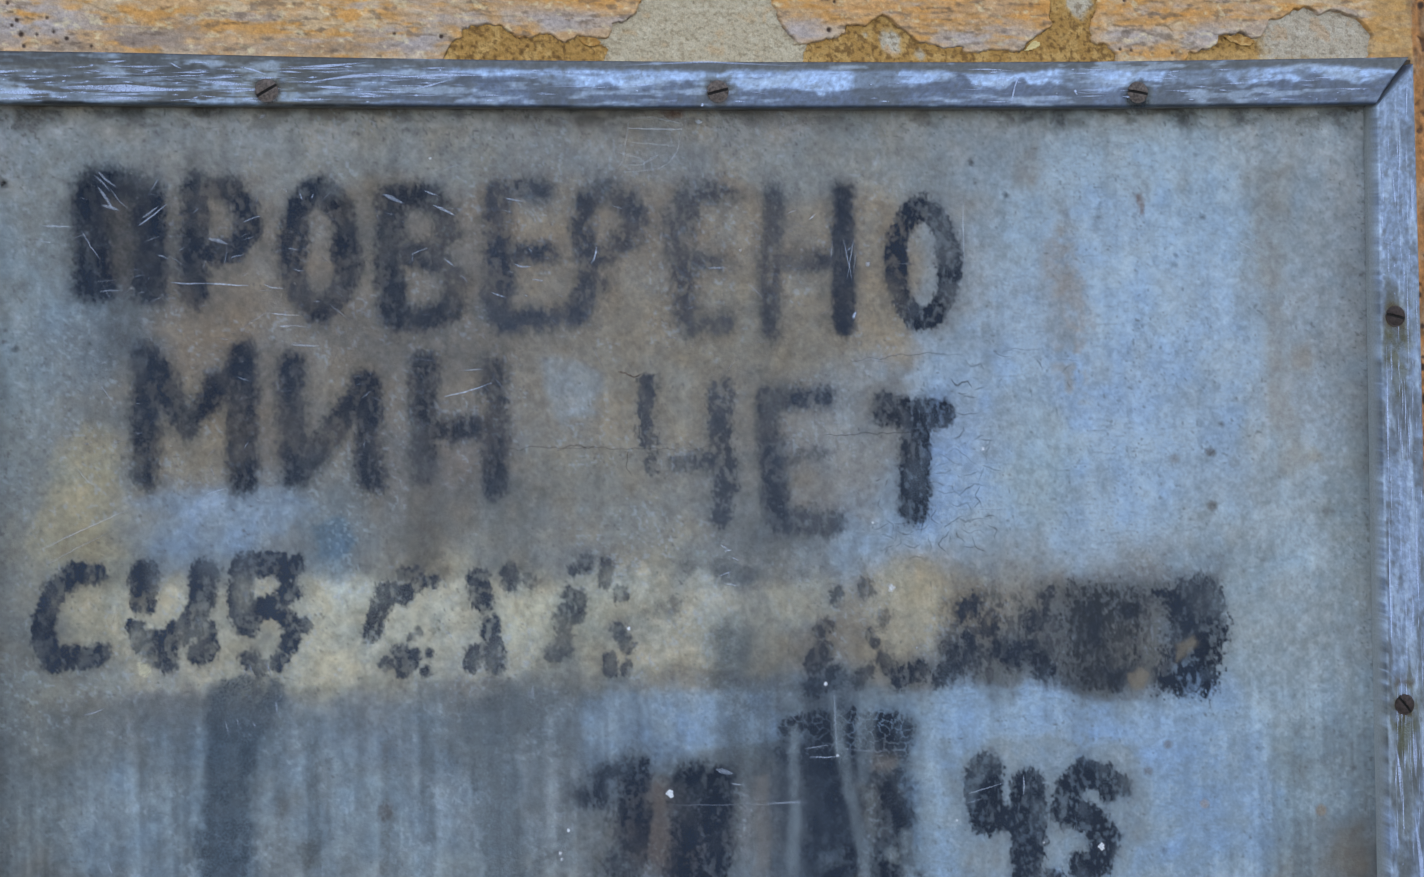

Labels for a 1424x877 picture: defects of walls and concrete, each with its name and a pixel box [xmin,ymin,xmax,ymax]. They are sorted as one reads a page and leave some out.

flaking render [444,0,1115,62]
flaking render [1186,7,1370,60]